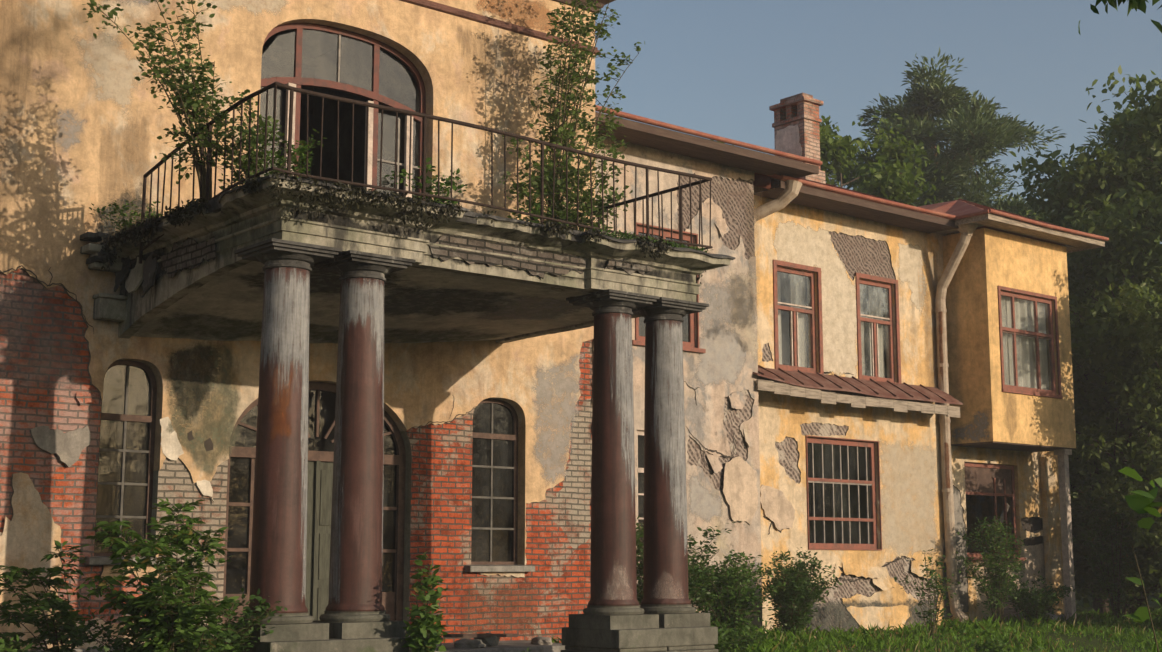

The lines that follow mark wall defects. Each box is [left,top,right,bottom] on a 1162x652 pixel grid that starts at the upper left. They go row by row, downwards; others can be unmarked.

flaking render [676,175,755,259]
flaking render [0,268,228,636]
water stain [155,314,262,418]
peeling [259,268,310,596]
water stain [309,324,339,342]
peeling [328,279,384,603]
flaking render [406,339,593,643]
peeling [650,320,753,550]
crack [684,381,746,467]
flaking render [775,422,848,483]
peeling [773,221,927,378]
flaking render [803,486,968,633]